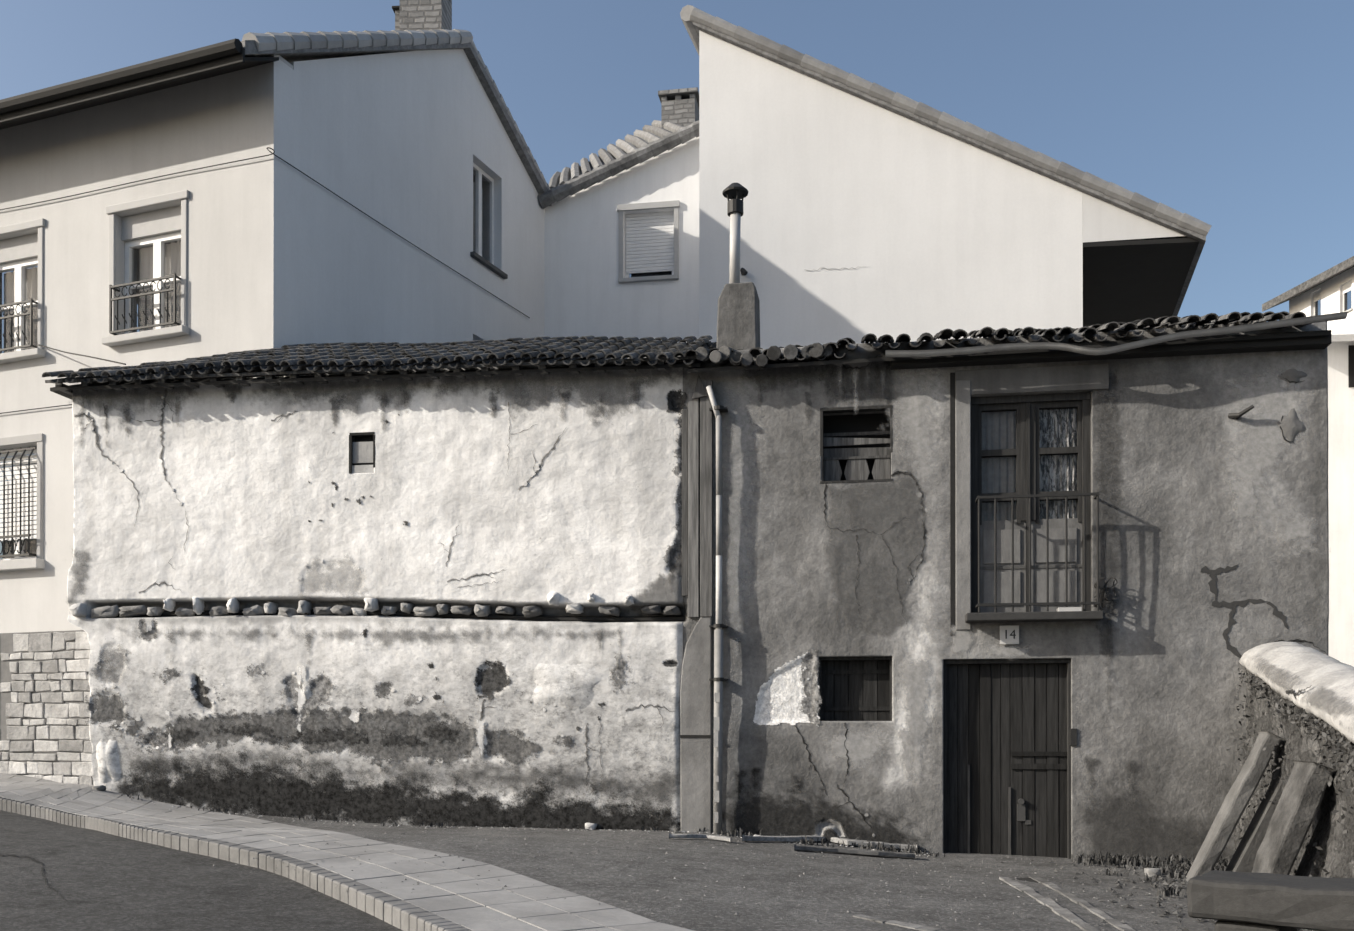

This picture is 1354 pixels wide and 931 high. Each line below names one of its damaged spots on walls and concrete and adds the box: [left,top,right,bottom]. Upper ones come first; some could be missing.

crack [506,402,566,490]
crack [74,396,189,593]
crack [441,526,502,587]
flaking render [138,618,157,641]
crack [1201,565,1318,658]
flaking render [84,648,580,767]
flaking render [597,653,634,720]
flaking render [753,650,820,727]
leakage [117,752,681,831]
crack [795,723,875,837]
crack [0,854,70,905]